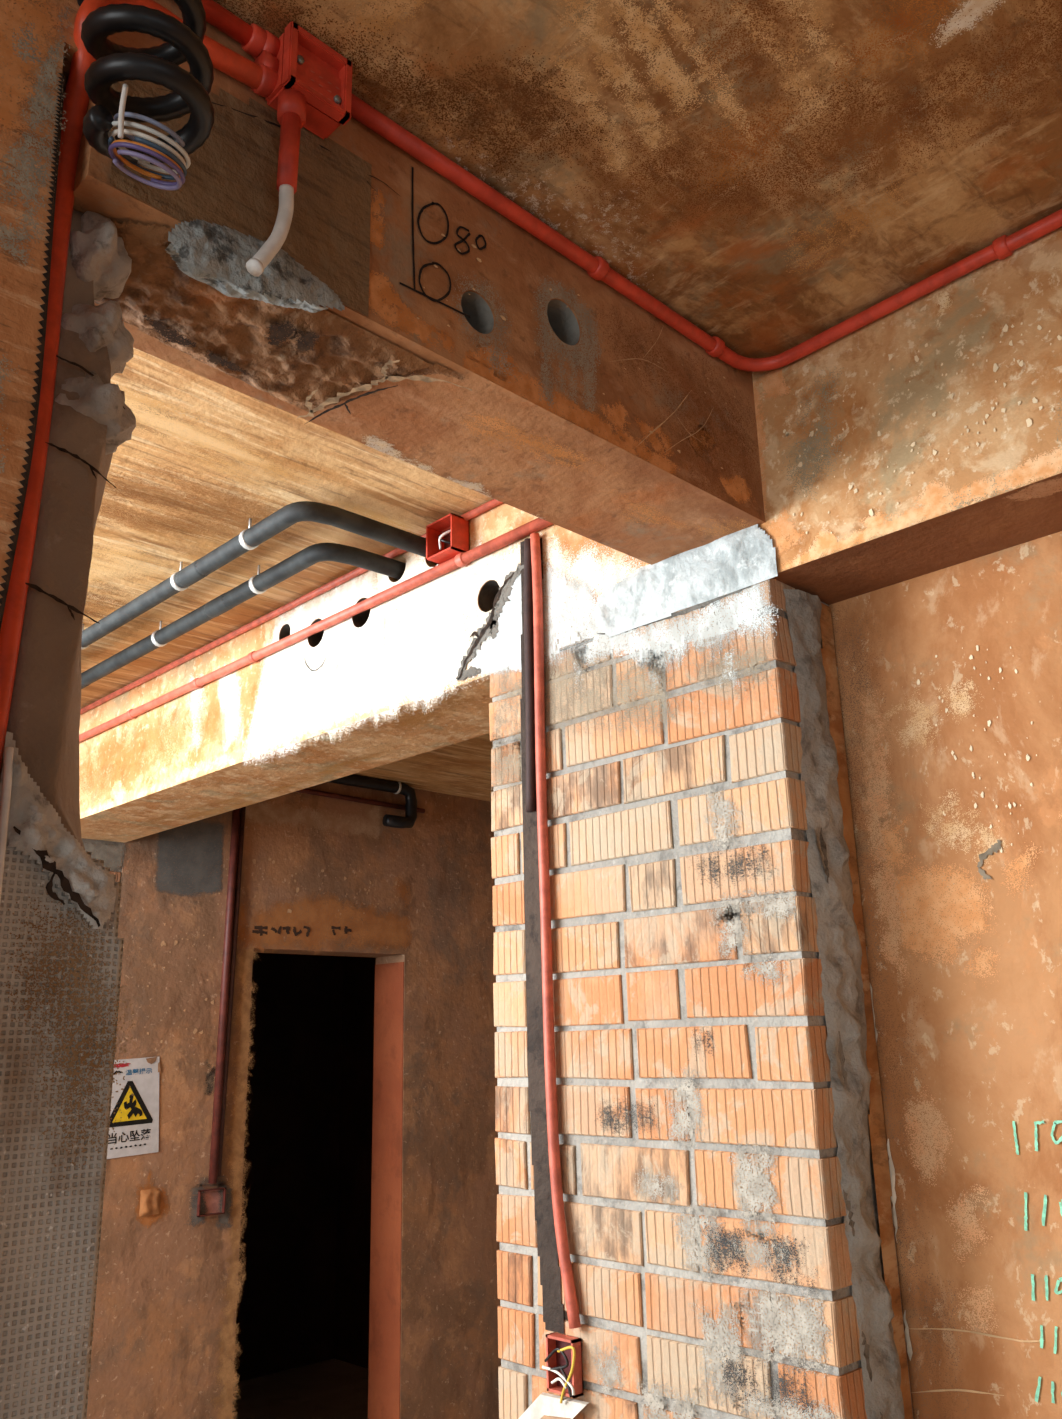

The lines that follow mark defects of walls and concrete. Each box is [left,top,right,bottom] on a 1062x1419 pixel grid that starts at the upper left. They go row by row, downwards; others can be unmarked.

spalling [94,220,717,501]
crack [45,442,116,488]
peeling [335,499,416,532]
peeling [88,539,180,585]
crack [25,583,100,624]
crack [13,826,100,927]
water stain [686,842,776,889]
water stain [691,1024,716,1061]
water stain [594,1095,661,1139]
water stain [700,1217,820,1297]
water stain [719,1353,820,1417]